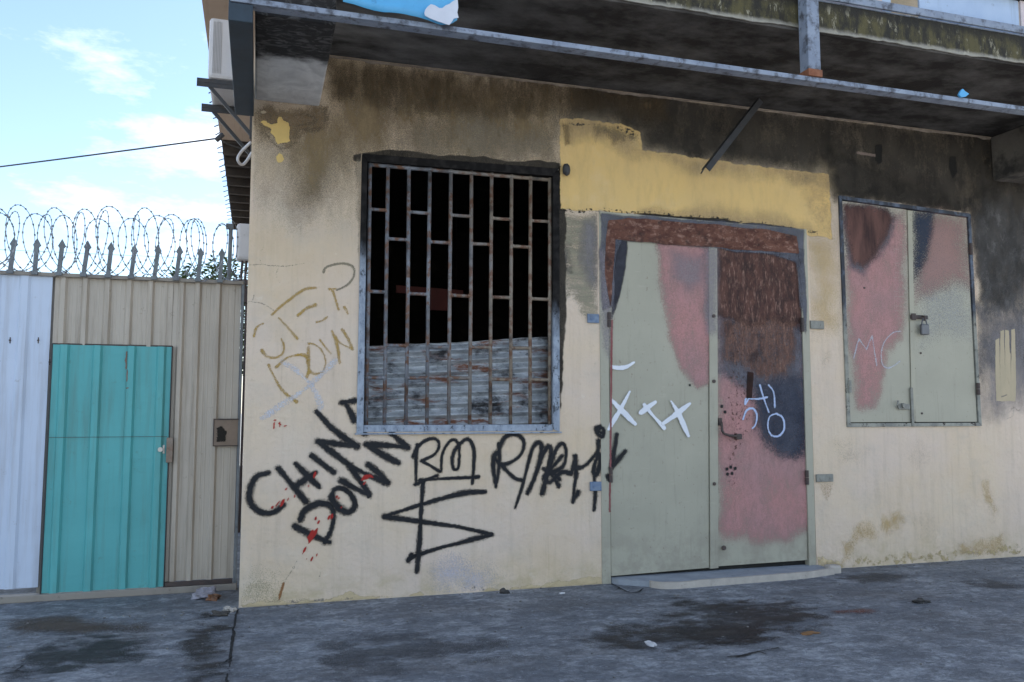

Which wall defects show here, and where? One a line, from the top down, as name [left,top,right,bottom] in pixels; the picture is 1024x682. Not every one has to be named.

damp [332,65,665,121]
damp [259,106,329,150]